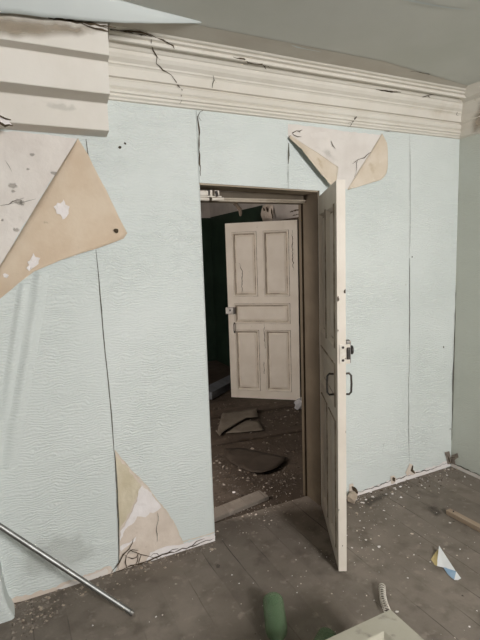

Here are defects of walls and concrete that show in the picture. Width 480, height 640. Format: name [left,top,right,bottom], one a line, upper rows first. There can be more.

crack [49,18,183,103]
flaking render [288,124,388,190]
peeling [0,115,127,298]
flaking render [349,451,480,496]
flaking render [12,450,215,604]
crack [111,539,212,573]